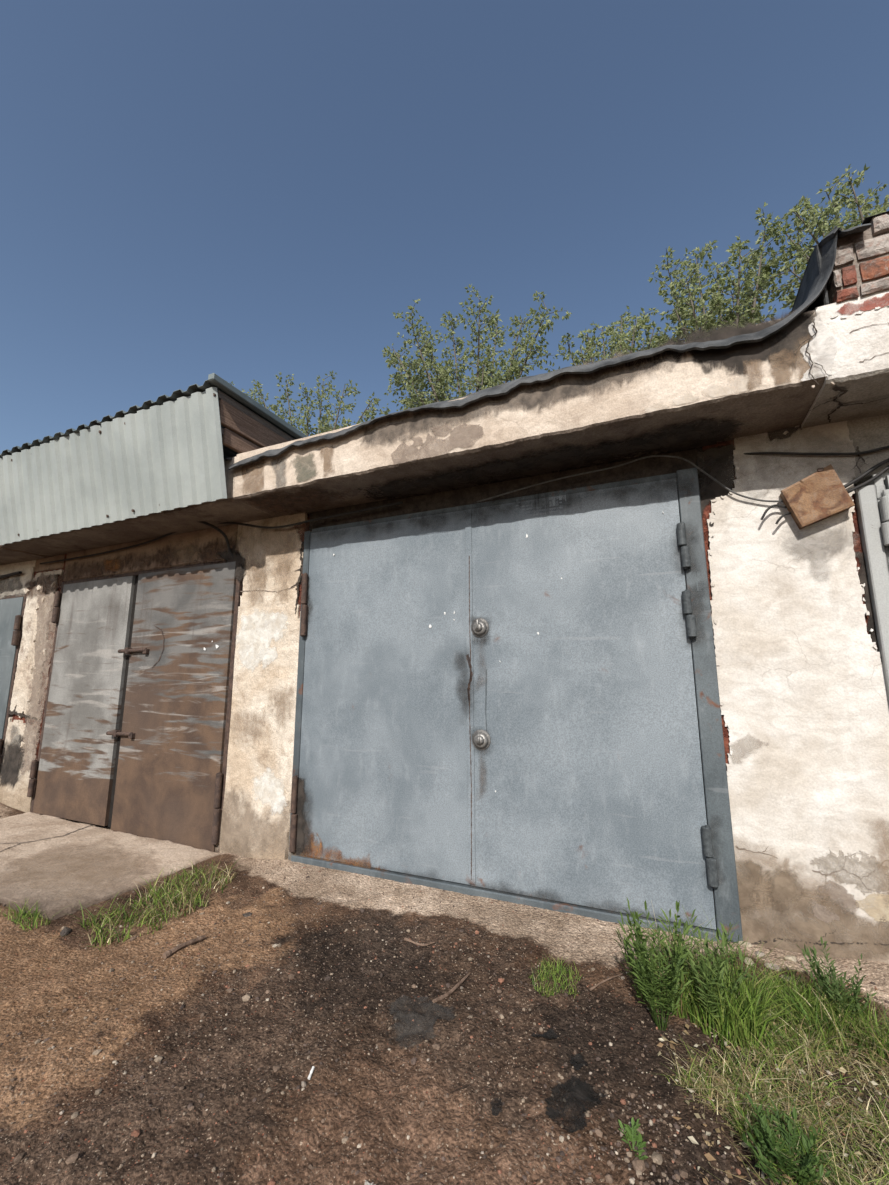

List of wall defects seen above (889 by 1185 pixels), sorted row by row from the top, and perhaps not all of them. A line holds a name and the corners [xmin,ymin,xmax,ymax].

damp [748,339,823,389]
crack [777,322,886,439]
flaking render [801,293,889,389]
flaking render [855,552,879,652]
rust [300,822,380,870]
damp [736,857,889,961]